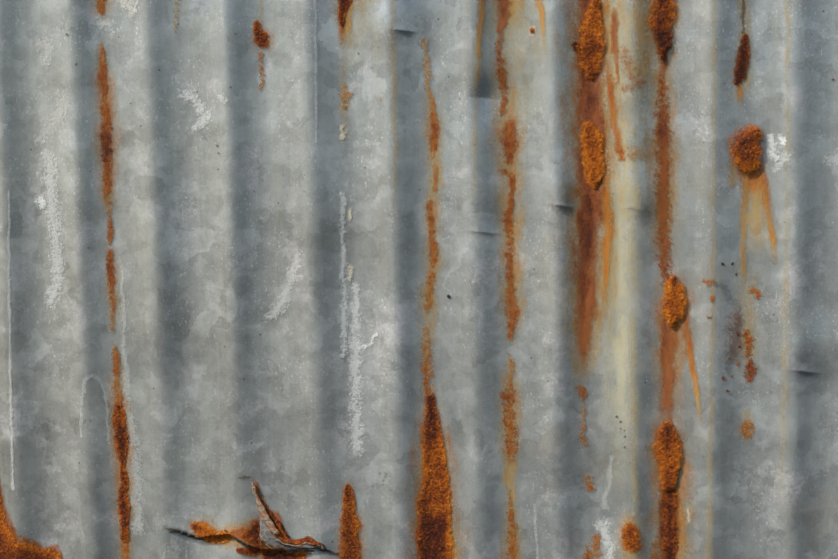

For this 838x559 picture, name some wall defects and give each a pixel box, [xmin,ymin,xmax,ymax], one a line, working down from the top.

rust [97,42,116,332]
rust [494,0,522,339]
rust [569,0,625,357]
rust [621,0,700,559]
rust [733,33,750,97]
rust [0,488,62,559]
rust [111,345,130,559]
crack [165,528,204,540]
rust [190,519,310,559]
crack [224,530,340,555]
rust [339,483,361,559]
rust [415,326,457,559]